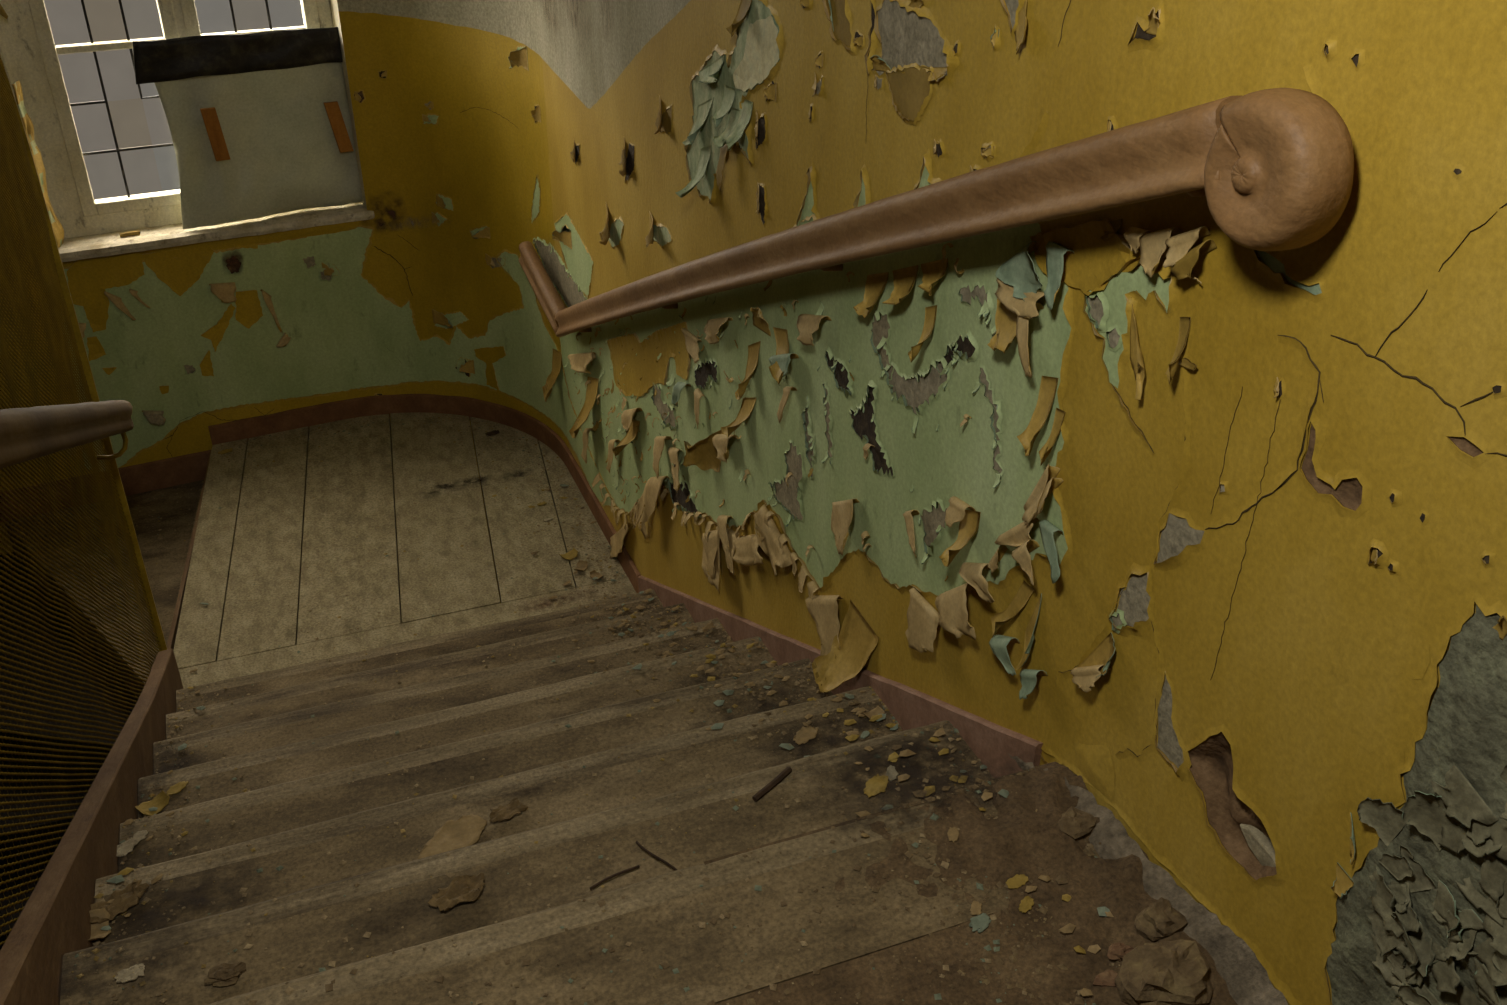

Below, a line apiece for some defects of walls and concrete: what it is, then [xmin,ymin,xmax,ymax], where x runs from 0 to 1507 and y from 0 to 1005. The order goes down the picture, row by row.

peeling [12,80,64,248]
peeling [570,142,581,167]
peeling [619,139,636,184]
peeling [654,0,784,228]
peeling [800,0,962,126]
peeling [913,138,946,190]
peeling [990,0,1029,54]
peeling [54,175,1217,699]
crack [1056,203,1507,689]
flaking render [1008,742,1303,1005]
flaking render [1154,667,1286,889]
peeling [1320,590,1507,1005]